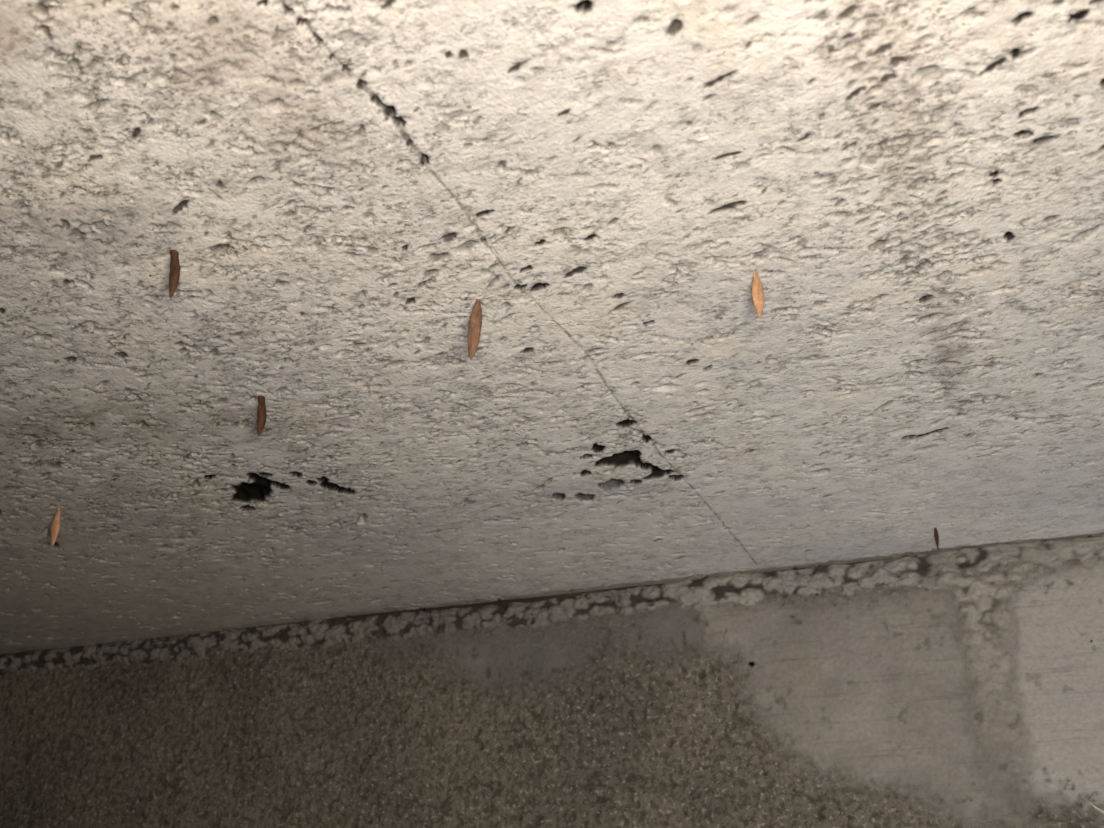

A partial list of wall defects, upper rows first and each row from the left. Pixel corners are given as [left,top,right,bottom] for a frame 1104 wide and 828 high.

crack [257,0,429,165]
spalling [231,471,355,510]
spalling [552,434,683,500]